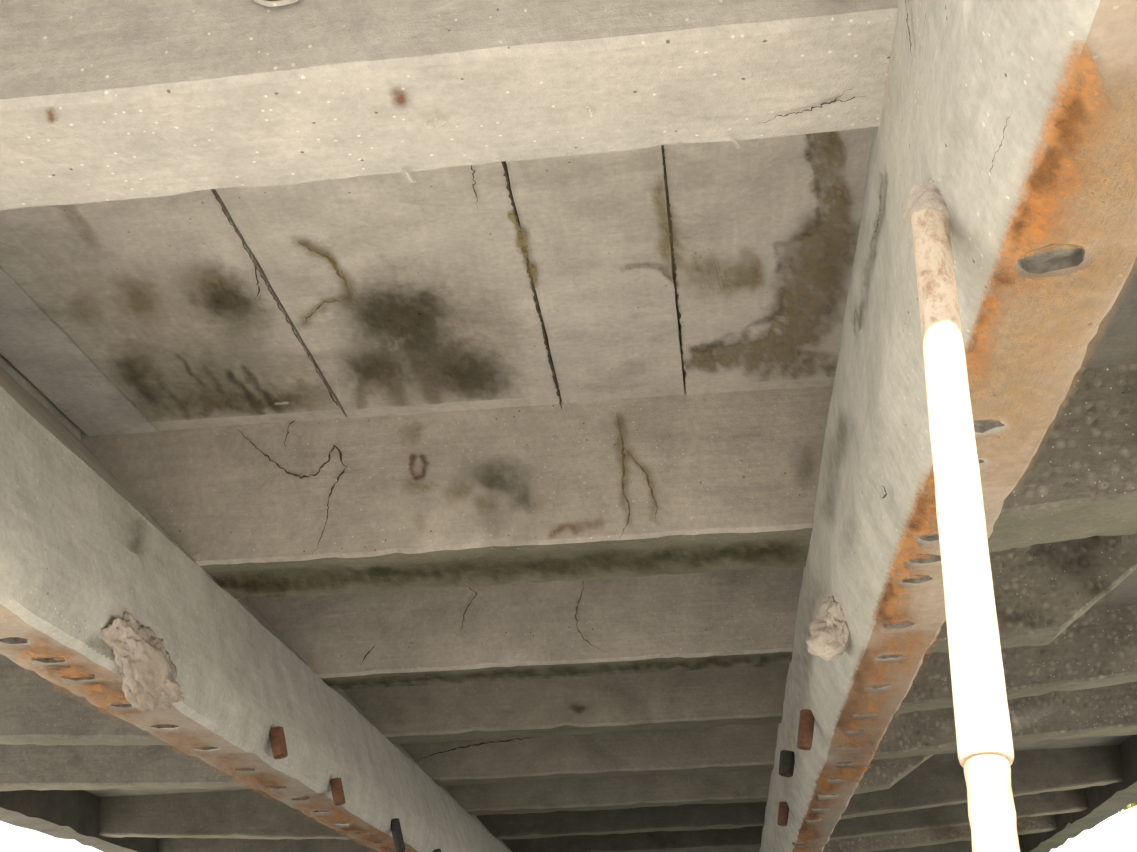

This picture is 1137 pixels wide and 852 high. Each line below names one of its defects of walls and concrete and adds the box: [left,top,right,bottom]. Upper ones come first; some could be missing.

water stain [126,359,301,416]
water stain [199,271,249,322]
water stain [357,294,494,405]
crack [502,161,562,410]
crack [661,145,687,384]
water stain [685,132,857,378]
corrosion [965,44,1104,378]
crack [238,420,347,557]
corrosion [410,455,427,488]
crack [617,413,658,537]
corrosion [25,643,130,714]
corrosion [793,476,938,852]